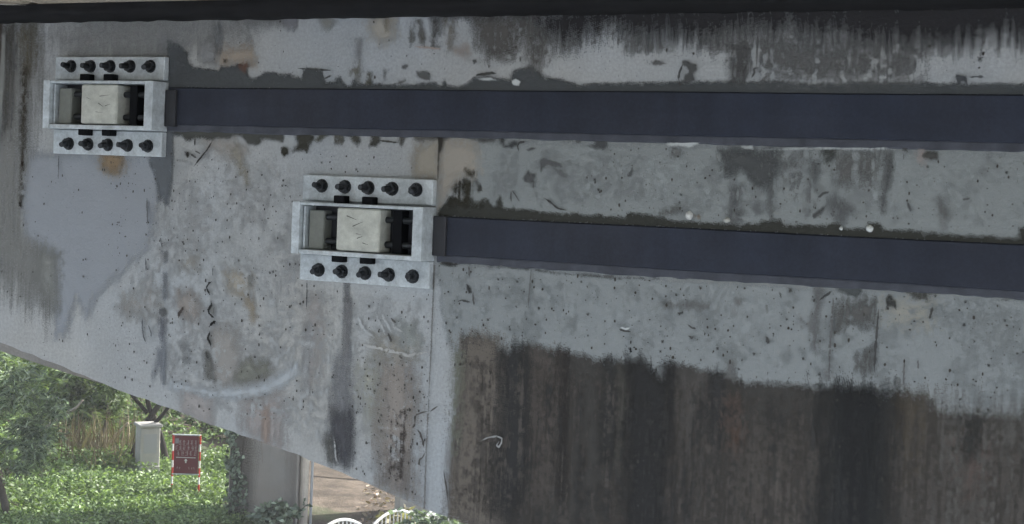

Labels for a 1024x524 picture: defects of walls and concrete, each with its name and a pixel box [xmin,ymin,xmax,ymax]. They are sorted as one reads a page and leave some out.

leakage [0,19,297,343]
leakage [347,8,1024,93]
leakage [112,250,429,524]
leakage [439,287,1024,524]